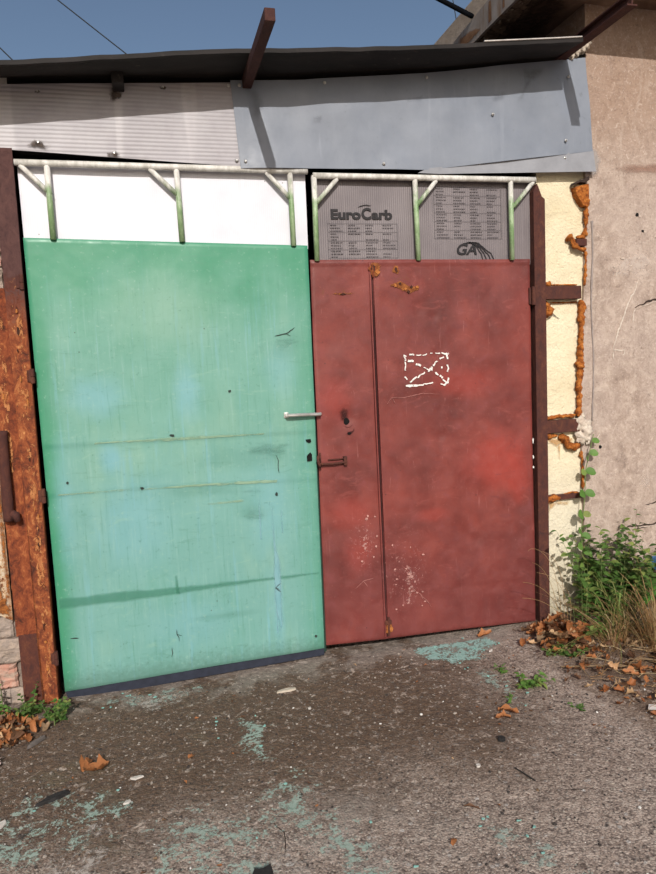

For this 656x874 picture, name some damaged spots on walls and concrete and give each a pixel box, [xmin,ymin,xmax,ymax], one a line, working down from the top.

crack [632,298,656,322]
corrosion [0,309,29,472]
corrosion [0,504,9,615]
corrosion [27,449,45,587]
crack [627,501,656,529]